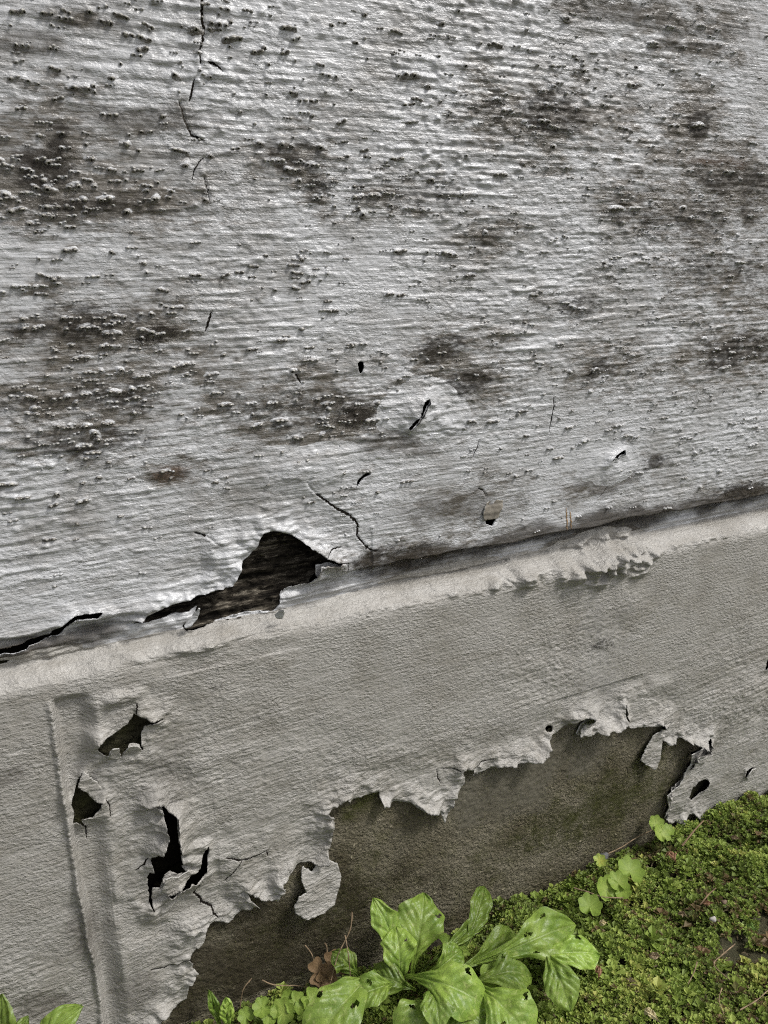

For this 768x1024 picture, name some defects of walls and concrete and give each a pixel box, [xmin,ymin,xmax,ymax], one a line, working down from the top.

damp [19,125,73,191]
crack [179,0,223,201]
damp [520,93,586,132]
damp [688,112,712,139]
damp [699,168,768,217]
damp [338,407,374,428]
crack [315,493,375,572]
peeling [134,531,343,631]
peeling [98,714,163,760]
peeling [71,772,102,826]
peeling [147,806,209,909]
peeling [161,698,708,1024]